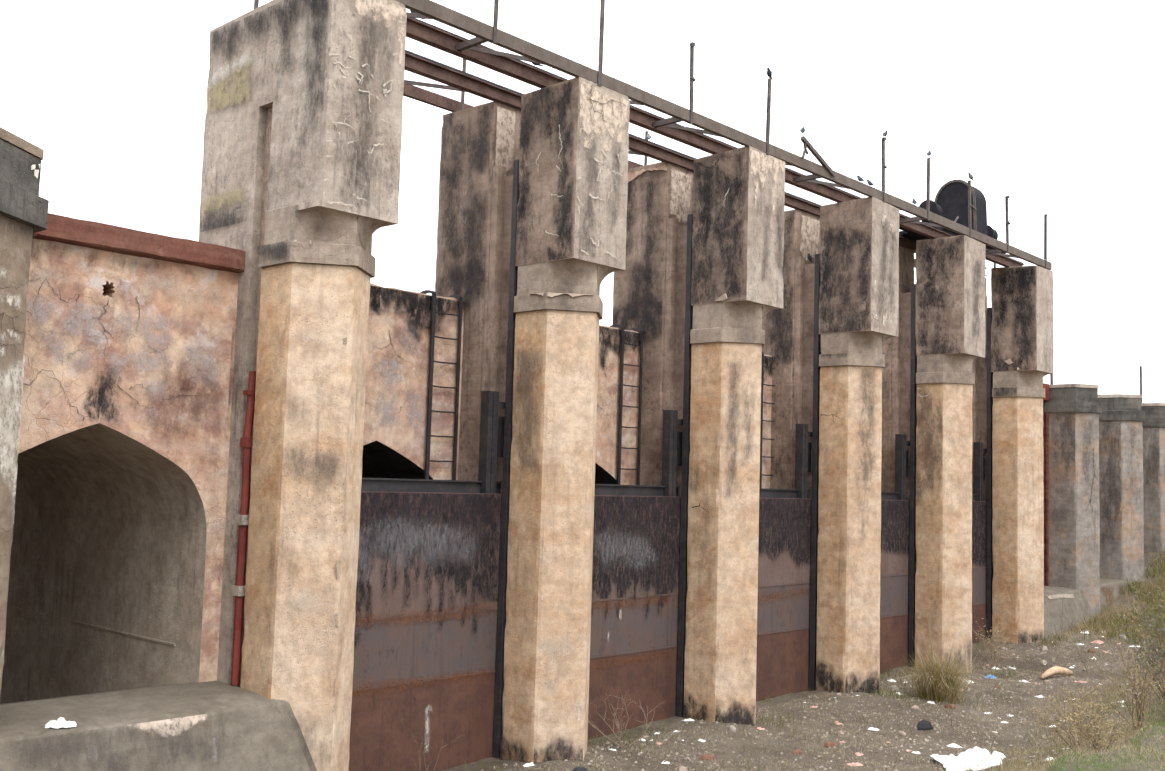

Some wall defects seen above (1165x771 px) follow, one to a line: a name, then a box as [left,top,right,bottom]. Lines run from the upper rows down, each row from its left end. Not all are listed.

crack [0,278,216,421]
leakage [354,492,501,646]
leakage [591,496,681,618]
leakage [758,498,812,565]
leakage [881,500,910,555]